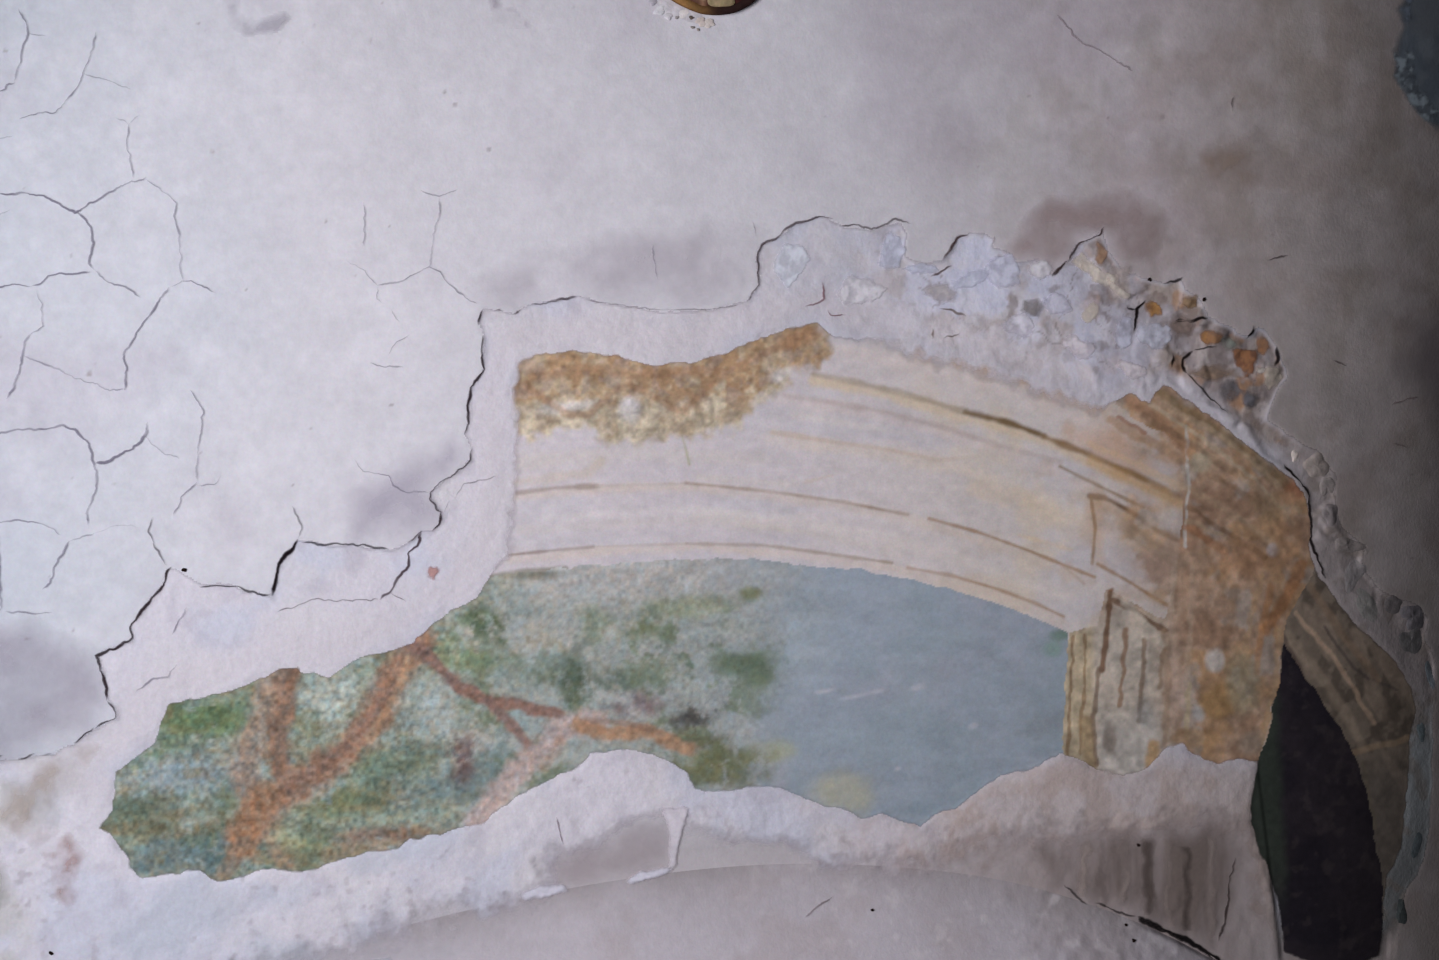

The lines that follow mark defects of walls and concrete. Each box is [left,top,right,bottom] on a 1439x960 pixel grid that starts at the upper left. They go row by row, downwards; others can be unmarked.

crack [0,13,28,91]
crack [26,37,95,117]
spalling [648,0,715,31]
crack [0,128,160,387]
crack [39,425,145,587]
crack [203,267,484,609]
crack [76,486,193,742]
spalling [0,217,1436,960]
crack [1068,861,1235,960]